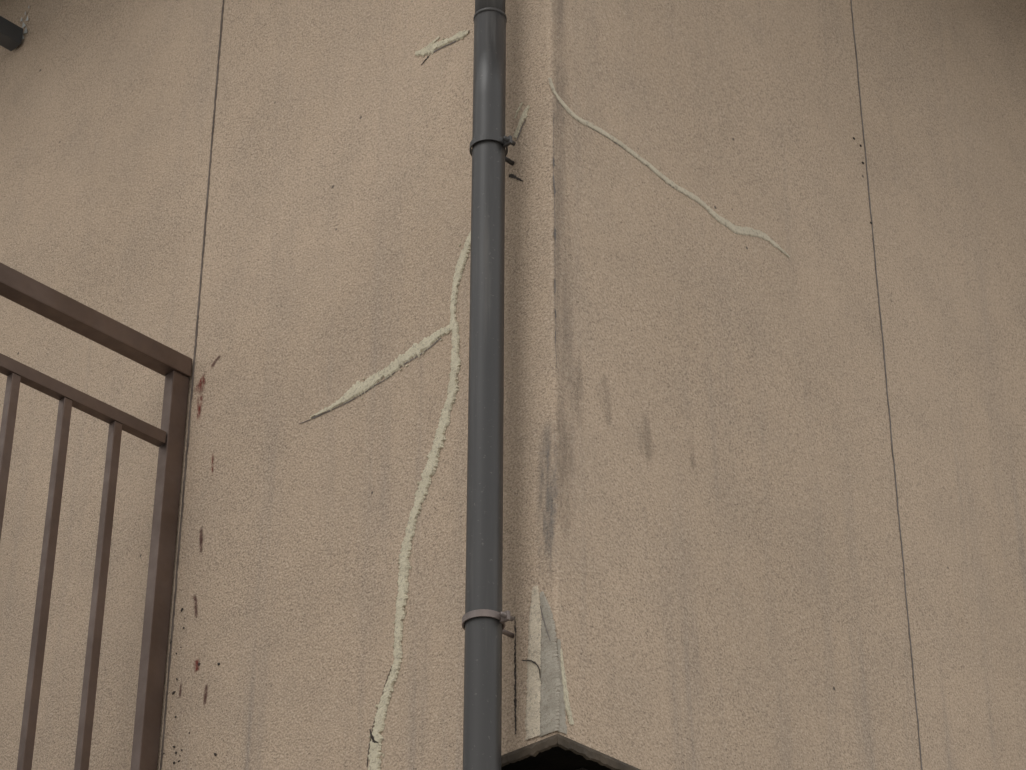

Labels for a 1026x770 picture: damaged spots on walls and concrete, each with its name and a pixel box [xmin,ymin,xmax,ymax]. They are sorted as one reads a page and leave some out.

crack [415,30,469,65]
crack [514,102,530,140]
crack [548,78,790,258]
crack [551,279,559,368]
crack [298,231,471,770]